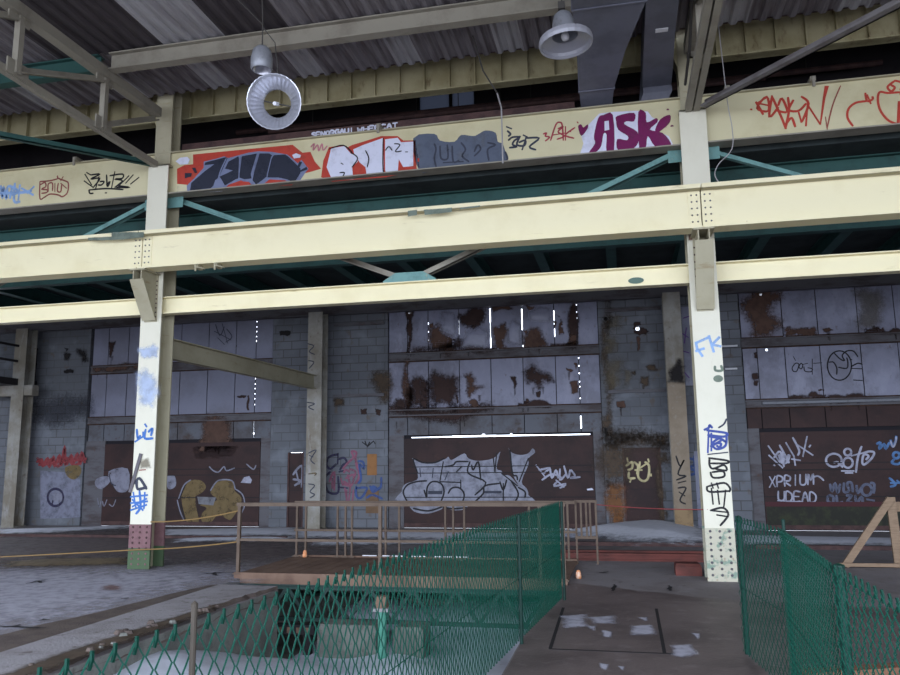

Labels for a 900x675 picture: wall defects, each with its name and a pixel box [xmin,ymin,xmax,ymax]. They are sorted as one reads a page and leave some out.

corrosion [523,303,579,348]
corrosion [388,311,494,424]
corrosion [510,364,555,408]
corrosion [566,363,579,394]
corrosion [199,414,232,452]
corrosion [595,301,670,523]
leakage [606,429,669,447]